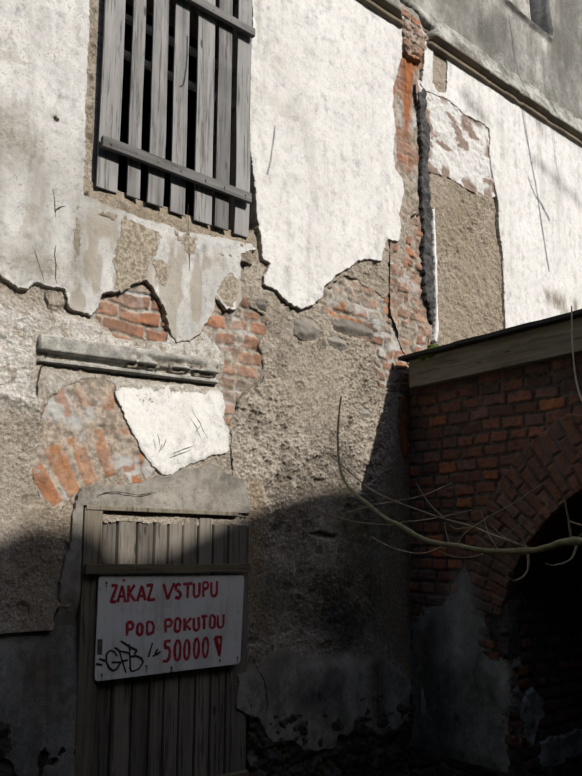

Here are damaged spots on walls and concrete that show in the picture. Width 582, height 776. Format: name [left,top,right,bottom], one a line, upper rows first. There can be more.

peeling [432,52,446,93]
spalling [425,92,504,346]
spalling [0,0,432,776]
peeling [517,686,582,773]